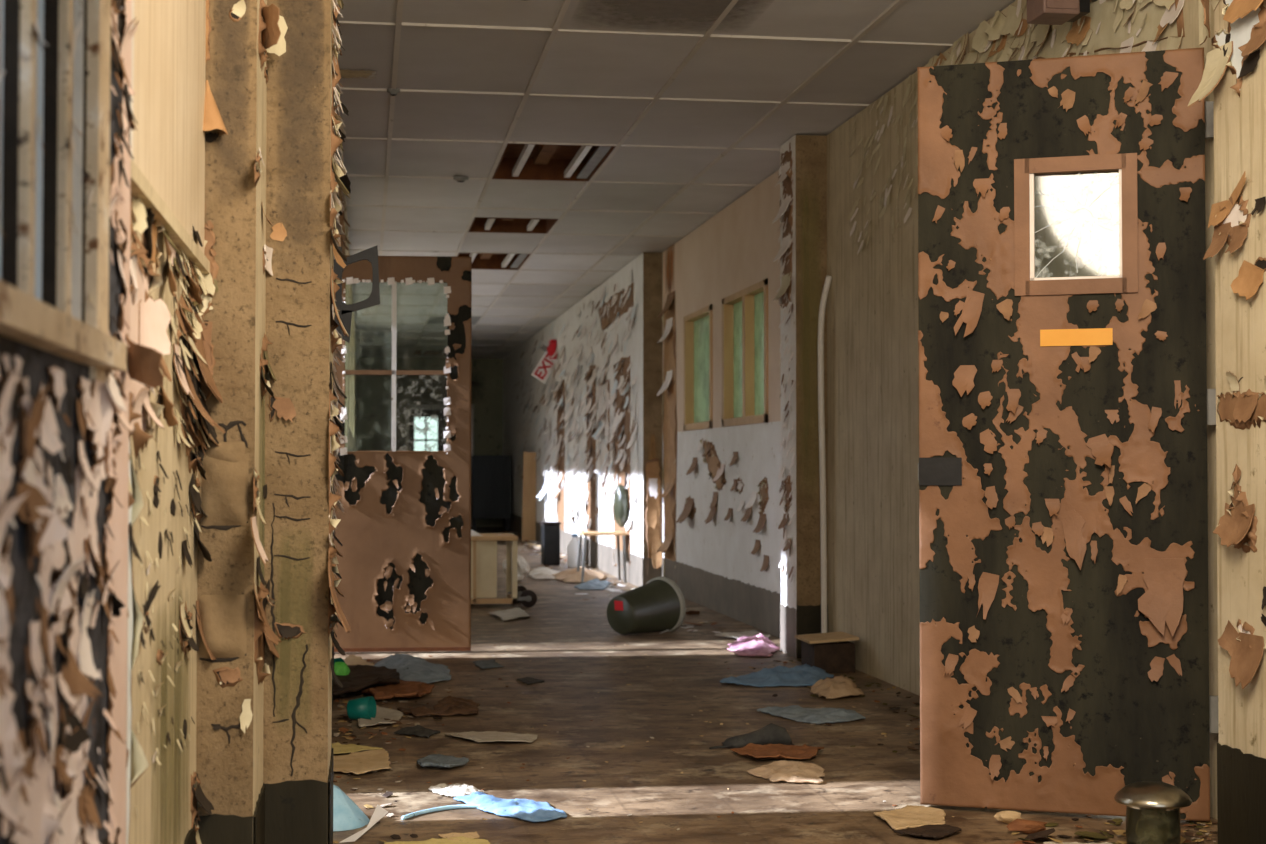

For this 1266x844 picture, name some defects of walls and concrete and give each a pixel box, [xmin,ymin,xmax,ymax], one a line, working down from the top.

peeling [0,0,308,844]
crack [270,494,310,776]
peeling [328,0,484,823]
peeling [502,144,795,599]
leakage [594,0,756,26]
peeling [831,0,1266,844]